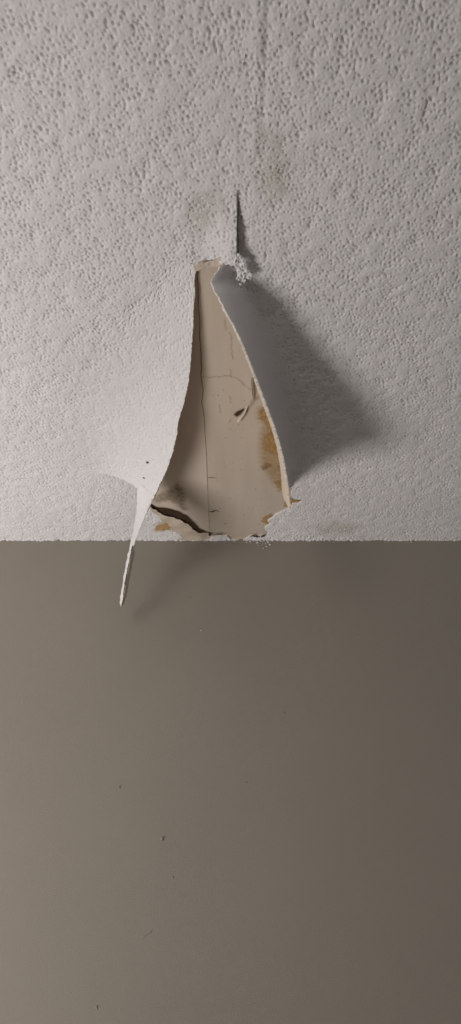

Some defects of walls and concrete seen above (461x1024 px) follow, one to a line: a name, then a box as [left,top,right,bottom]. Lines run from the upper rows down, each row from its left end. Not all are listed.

peeling [75,180,305,607]